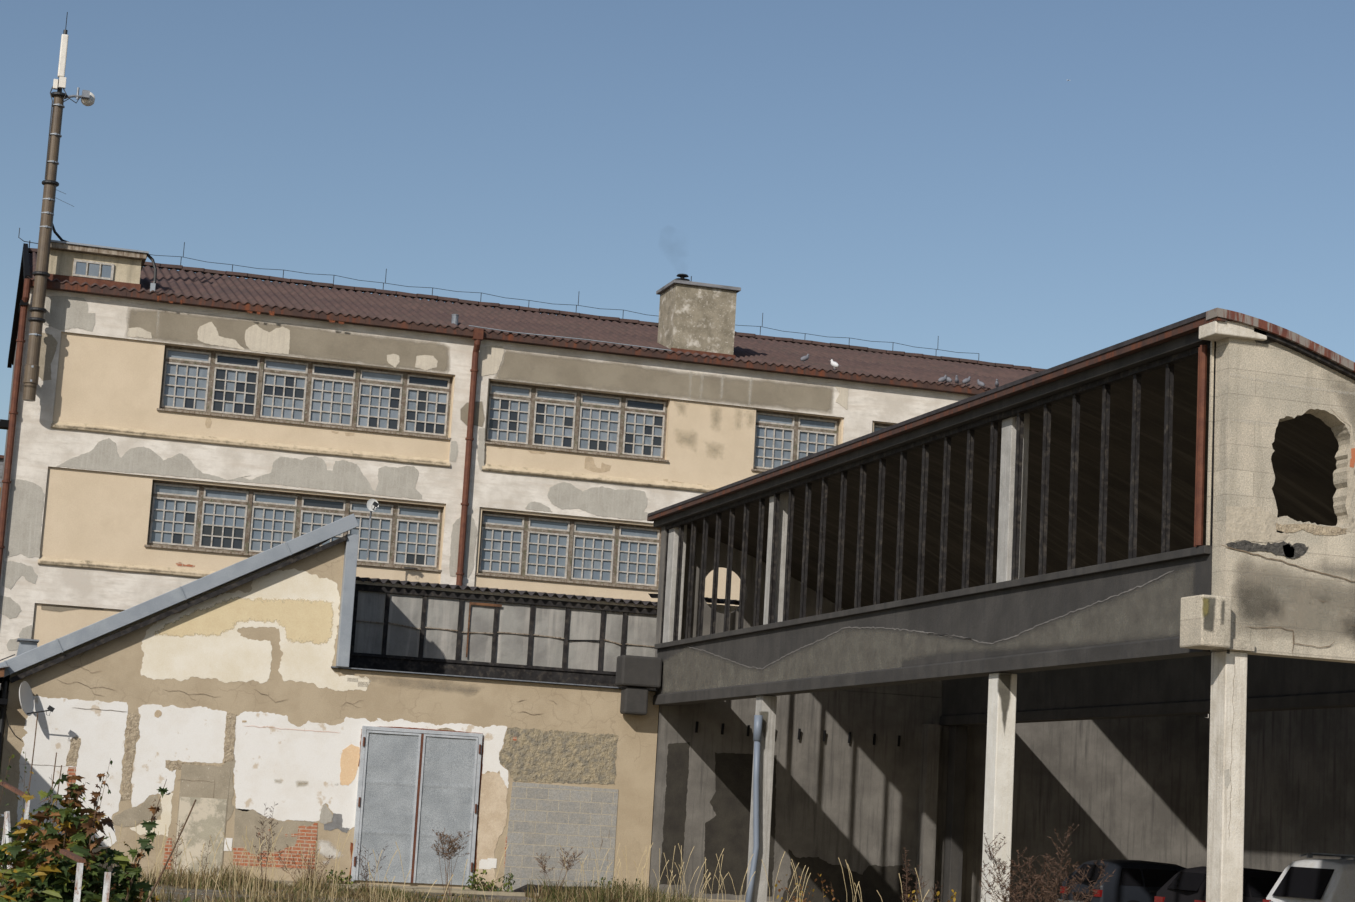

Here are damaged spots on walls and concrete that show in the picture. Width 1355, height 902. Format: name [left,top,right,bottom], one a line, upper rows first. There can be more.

peeling [39,296,95,381]
peeling [127,327,152,338]
peeling [197,322,290,355]
peeling [387,354,438,371]
peeling [56,438,422,499]
spalling [1225,409,1355,559]
peeling [0,479,45,651]
peeling [140,568,370,691]
water stain [1204,567,1355,635]
crack [1220,544,1355,602]
crack [1248,625,1353,653]
peeling [17,696,618,886]